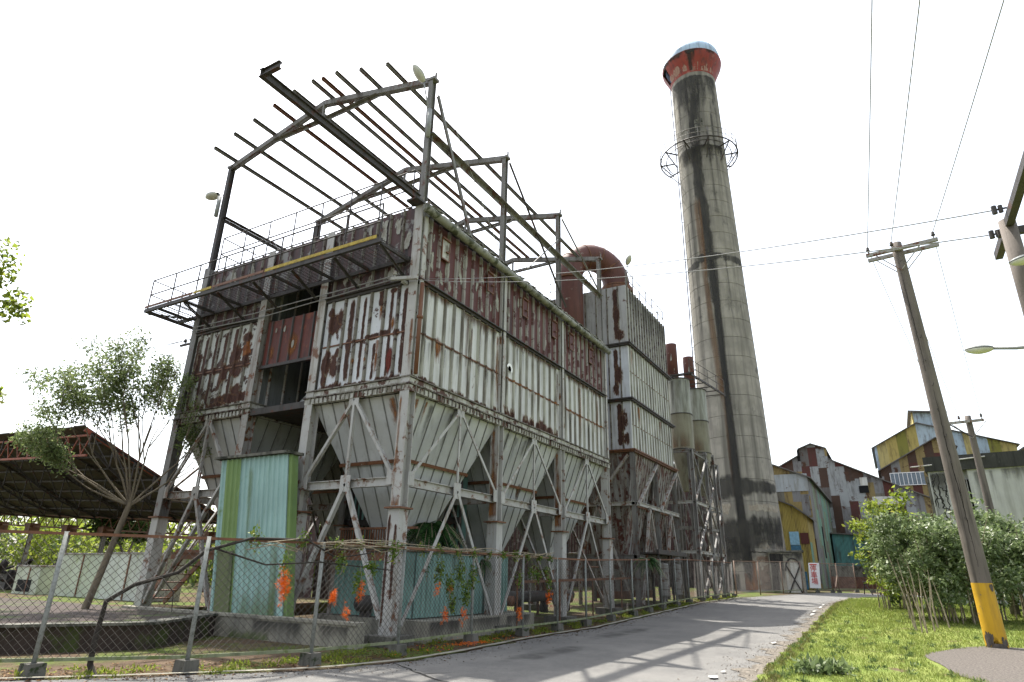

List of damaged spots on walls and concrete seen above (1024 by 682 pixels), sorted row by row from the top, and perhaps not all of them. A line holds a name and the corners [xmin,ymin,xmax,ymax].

rust [351,340,392,374]
rust [409,313,602,428]
water stain [663,48,802,592]